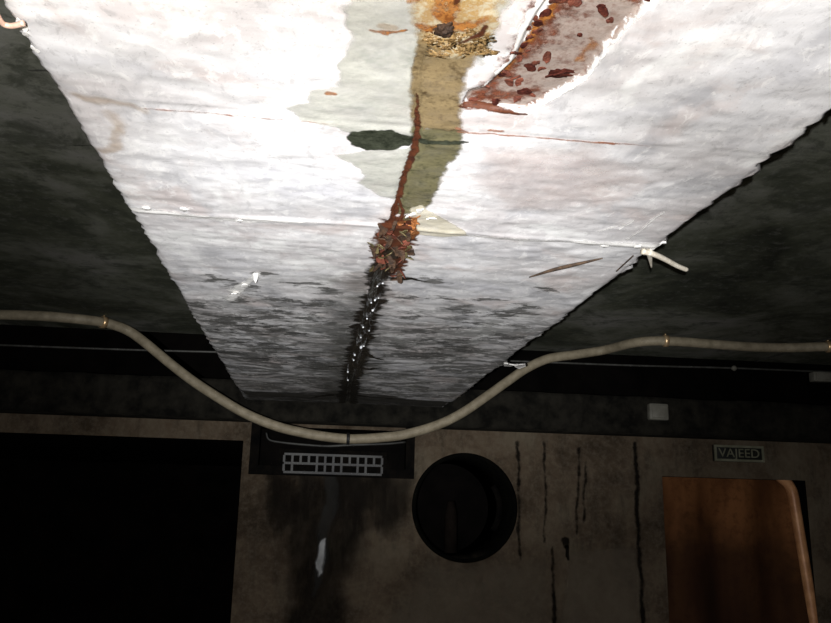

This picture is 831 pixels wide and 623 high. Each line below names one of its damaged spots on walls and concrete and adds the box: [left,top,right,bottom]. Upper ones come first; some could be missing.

corrosion [370,0,503,59]
spalling [459,0,655,115]
crack [387,93,421,223]
corrosion [367,215,420,284]
crack [311,249,426,404]
damp [267,458,409,623]
crack [514,441,522,556]
crack [542,443,557,623]
crack [575,448,587,535]
crack [633,442,646,623]